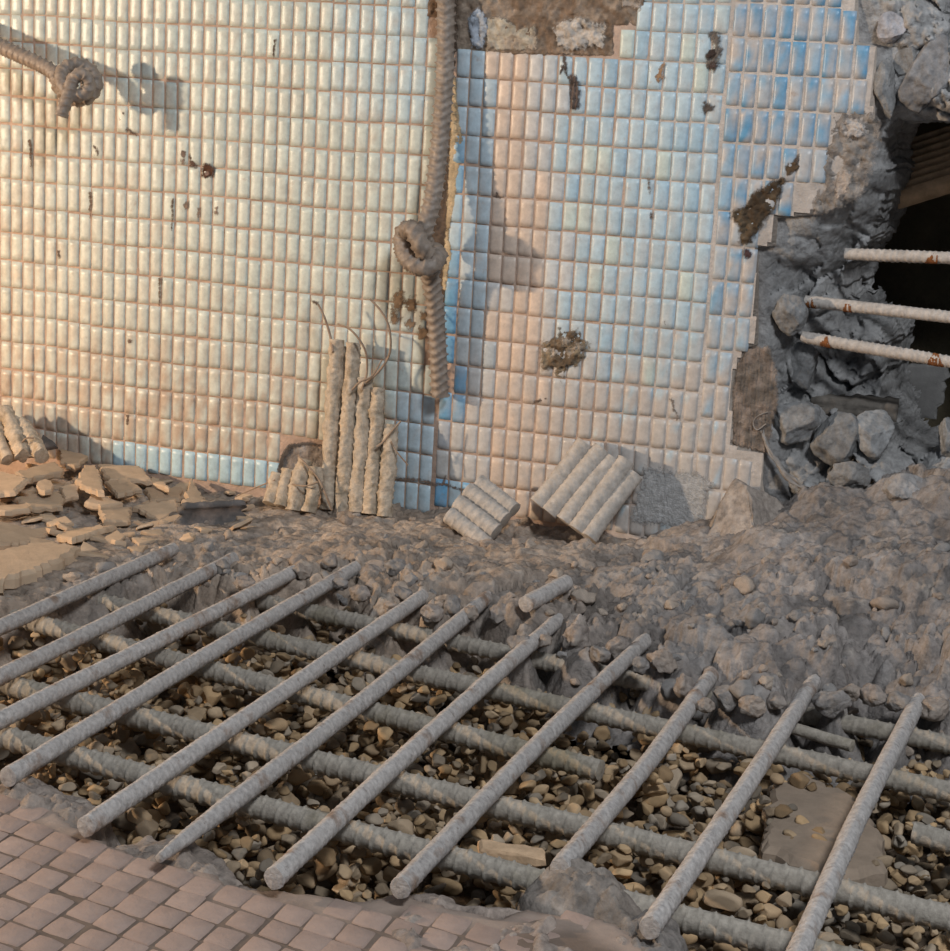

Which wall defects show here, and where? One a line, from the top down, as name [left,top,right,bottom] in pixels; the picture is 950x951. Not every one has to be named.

peeling [392,0,644,398]
peeling [813,109,881,215]
peeling [731,346,779,453]
spalling [800,331,950,368]
spalling [804,295,950,323]
spalling [844,248,950,264]
spalling [0,543,950,951]